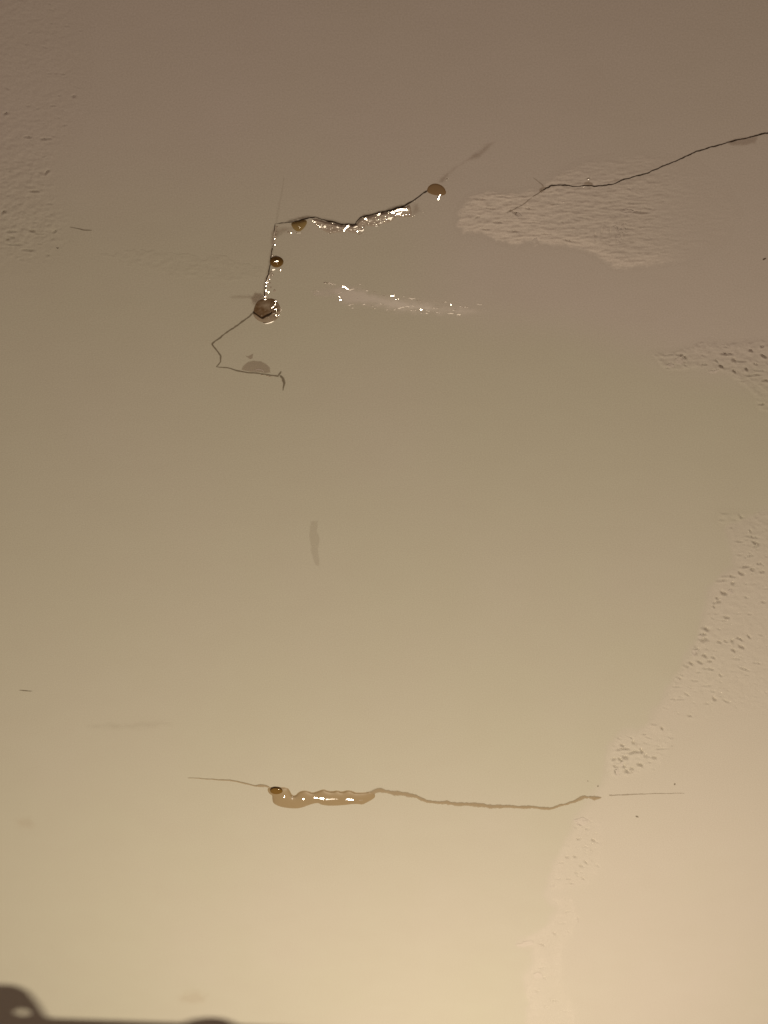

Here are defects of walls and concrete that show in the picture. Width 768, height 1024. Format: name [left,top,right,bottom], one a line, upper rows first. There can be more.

crack [511,133,768,211]
spalling [452,150,744,273]
crack [212,191,427,389]
water stain [311,282,482,316]
crack [196,778,269,788]
crack [369,788,600,810]